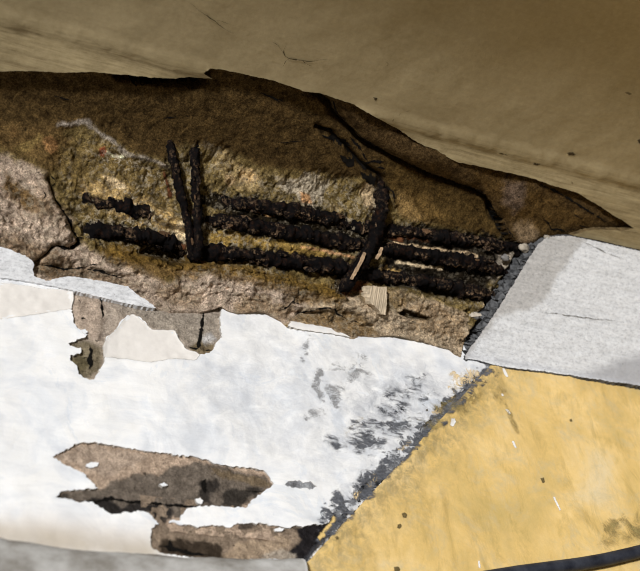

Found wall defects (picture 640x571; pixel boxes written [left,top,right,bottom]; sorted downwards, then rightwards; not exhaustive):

spalling [0,69,521,380]
peeling [53,444,338,560]
water stain [304,364,494,562]